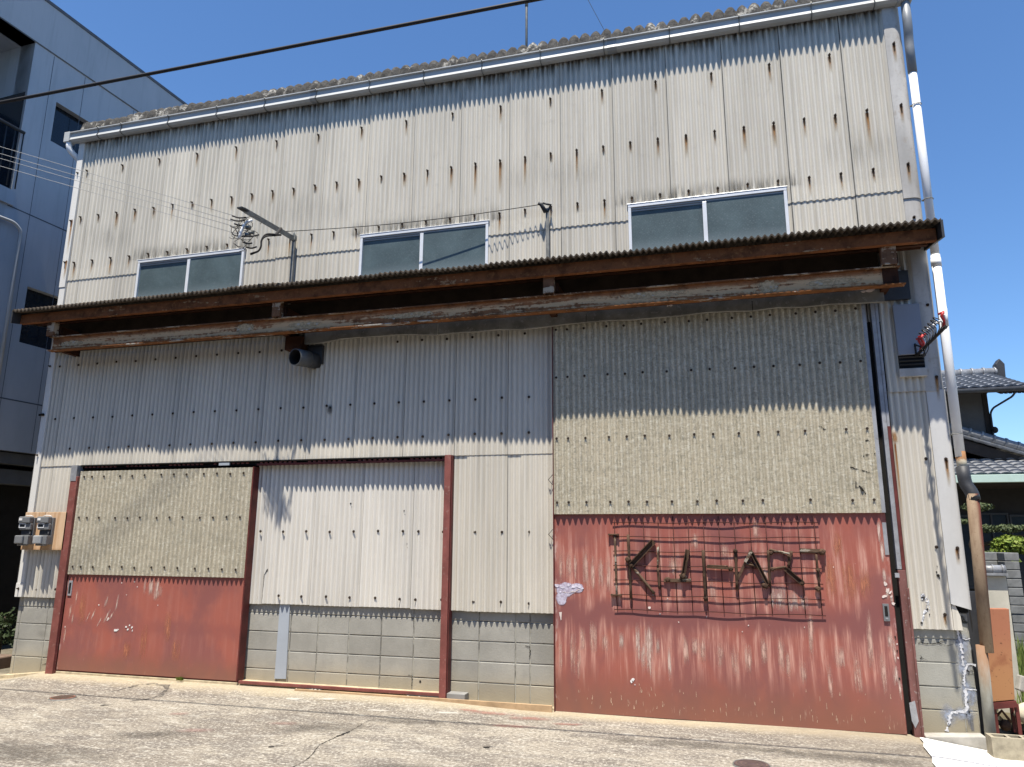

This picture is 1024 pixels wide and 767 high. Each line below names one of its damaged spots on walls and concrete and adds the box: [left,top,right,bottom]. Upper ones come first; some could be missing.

peeling [64,581,159,646]
peeling [555,555,610,619]
damp [944,639,975,730]